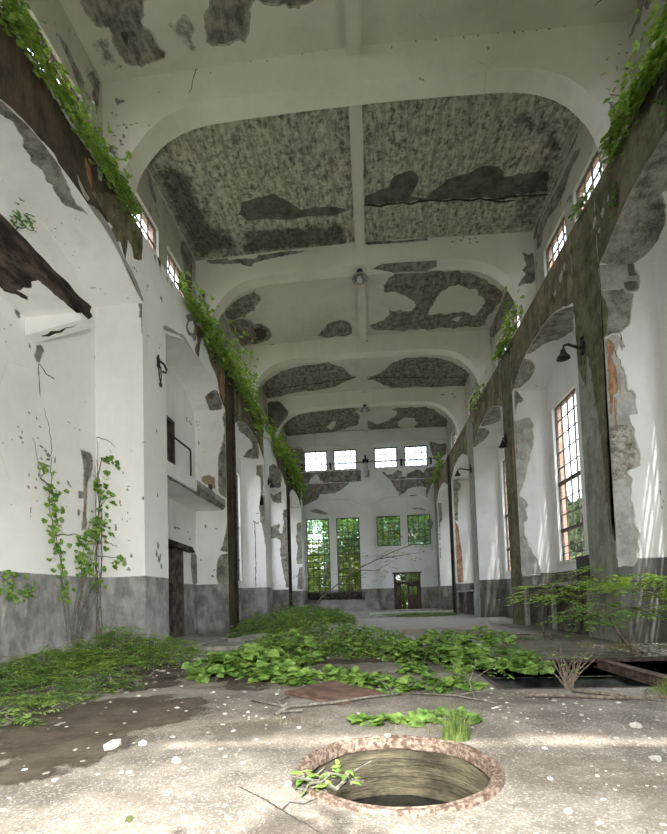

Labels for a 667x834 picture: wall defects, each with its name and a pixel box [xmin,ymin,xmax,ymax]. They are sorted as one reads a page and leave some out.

peeling [80,0,166,67]
peeling [204,0,314,47]
peeling [0,98,149,337]
peeling [147,106,355,294]
crack [364,194,549,207]
peeling [362,93,582,286]
crack [42,324,77,337]
peeling [369,260,515,338]
rust [607,340,620,426]
peeling [599,132,667,567]
spalling [513,306,574,577]
spalling [67,449,93,531]